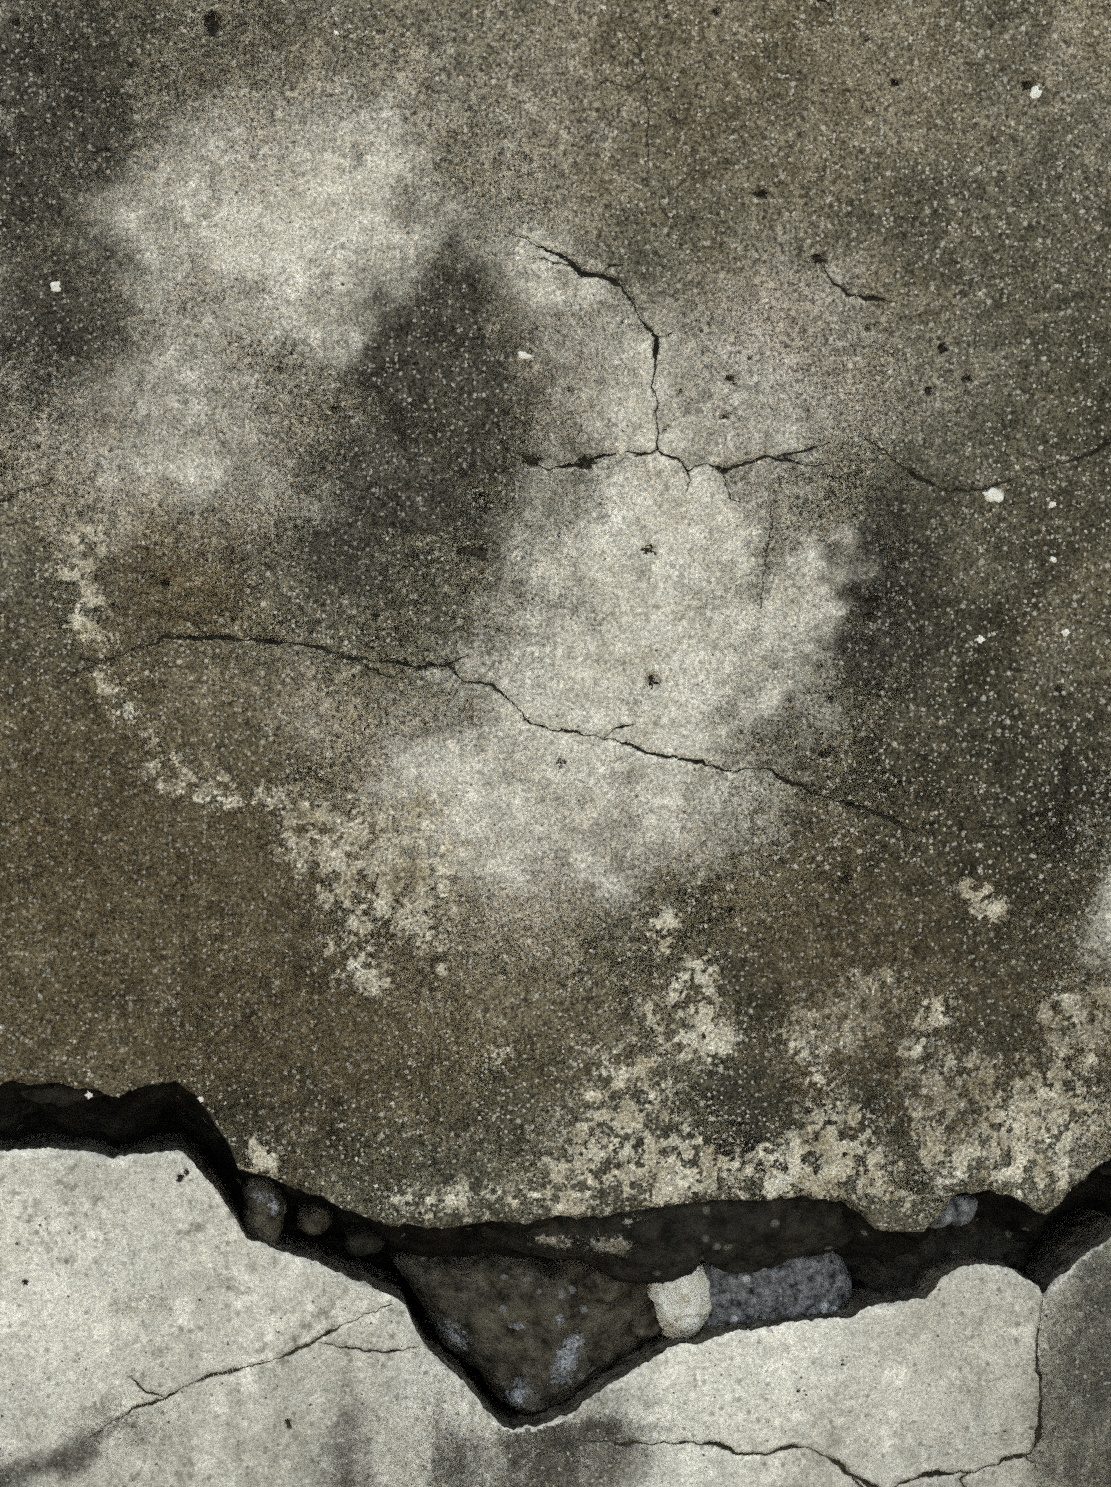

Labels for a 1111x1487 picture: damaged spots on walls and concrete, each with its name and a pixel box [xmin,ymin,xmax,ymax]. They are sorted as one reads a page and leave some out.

crack [818,259,895,302]
damp [0,0,962,910]
crack [500,233,830,609]
crack [866,438,1111,493]
crack [58,619,1056,858]
crack [0,1081,557,1439]
spalling [0,902,1111,1430]
crack [833,1204,933,1274]
crack [963,1170,1111,1251]
damp [0,1430,102,1487]
crack [573,1301,1043,1487]